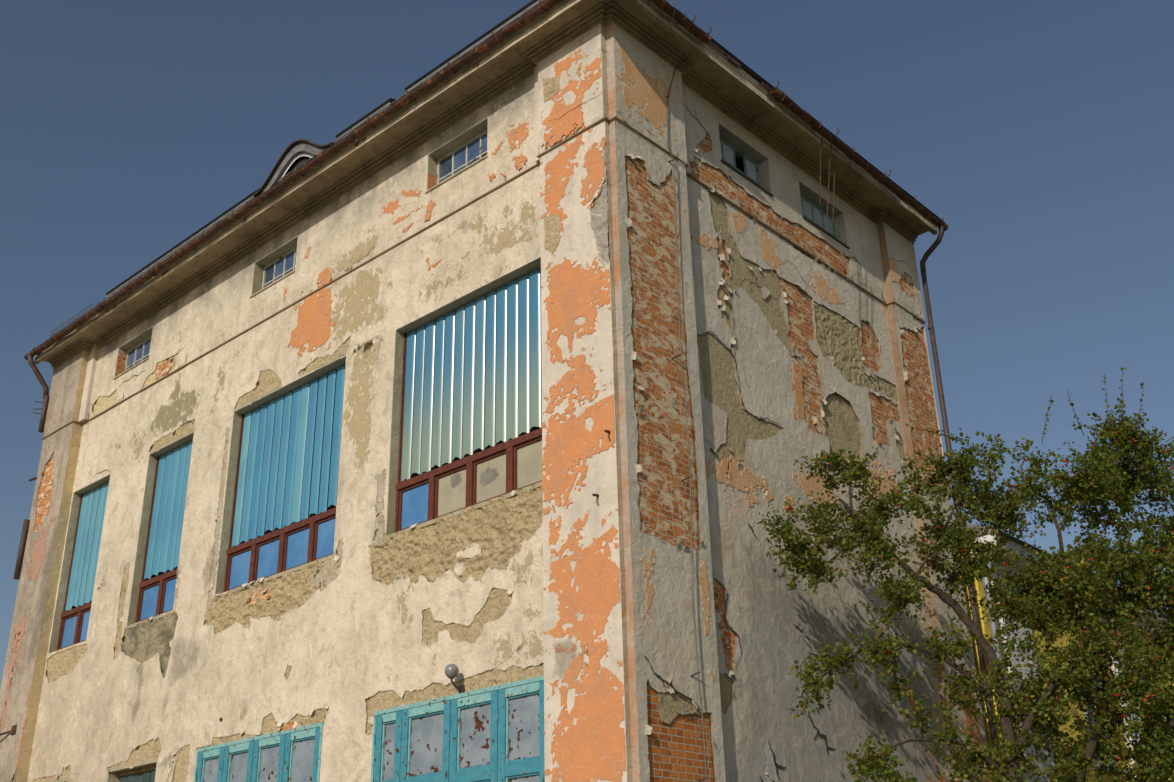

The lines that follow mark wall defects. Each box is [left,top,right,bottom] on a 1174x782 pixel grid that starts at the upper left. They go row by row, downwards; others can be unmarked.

peeling [615,38,679,140]
peeling [283,267,351,376]
flaking render [364,37,626,782]
flaking render [625,132,945,782]
flaking render [26,454,54,589]
flaking render [204,427,343,637]
peeling [0,607,31,737]
flaking render [33,764,71,782]
flaking render [45,644,88,683]
flaking render [113,563,181,678]
rust [373,700,494,782]
rust [499,689,544,761]